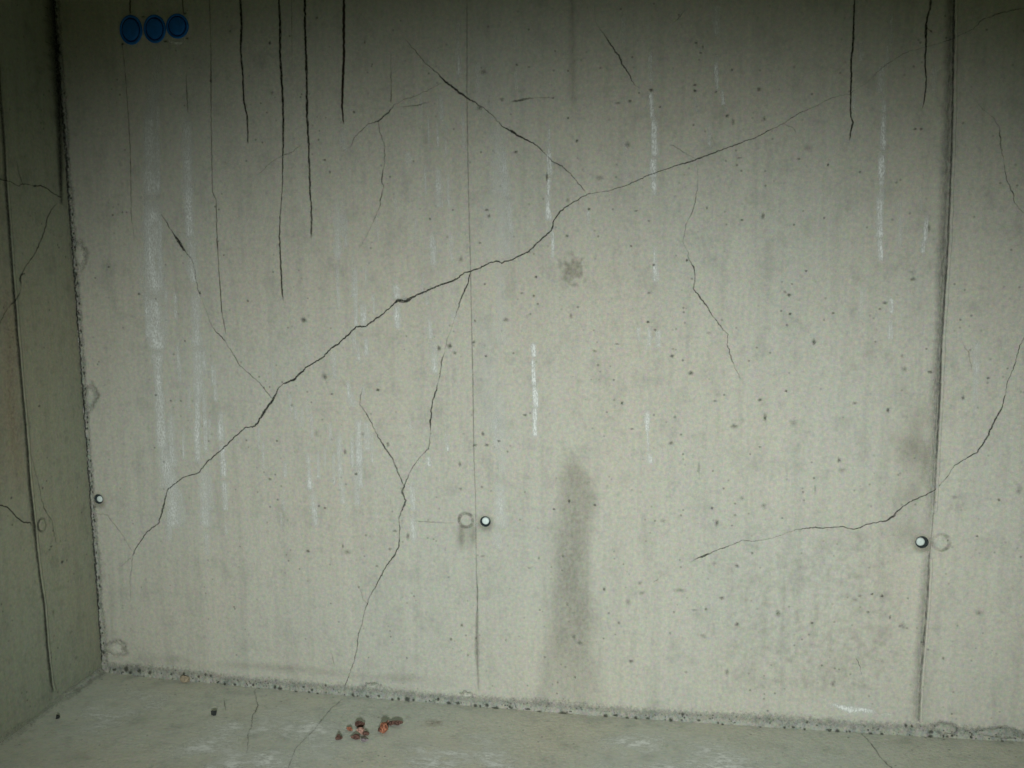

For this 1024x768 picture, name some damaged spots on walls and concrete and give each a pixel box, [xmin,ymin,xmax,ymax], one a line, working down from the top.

crack [439,76,567,171]
crack [135,196,584,550]
crack [958,345,1020,464]